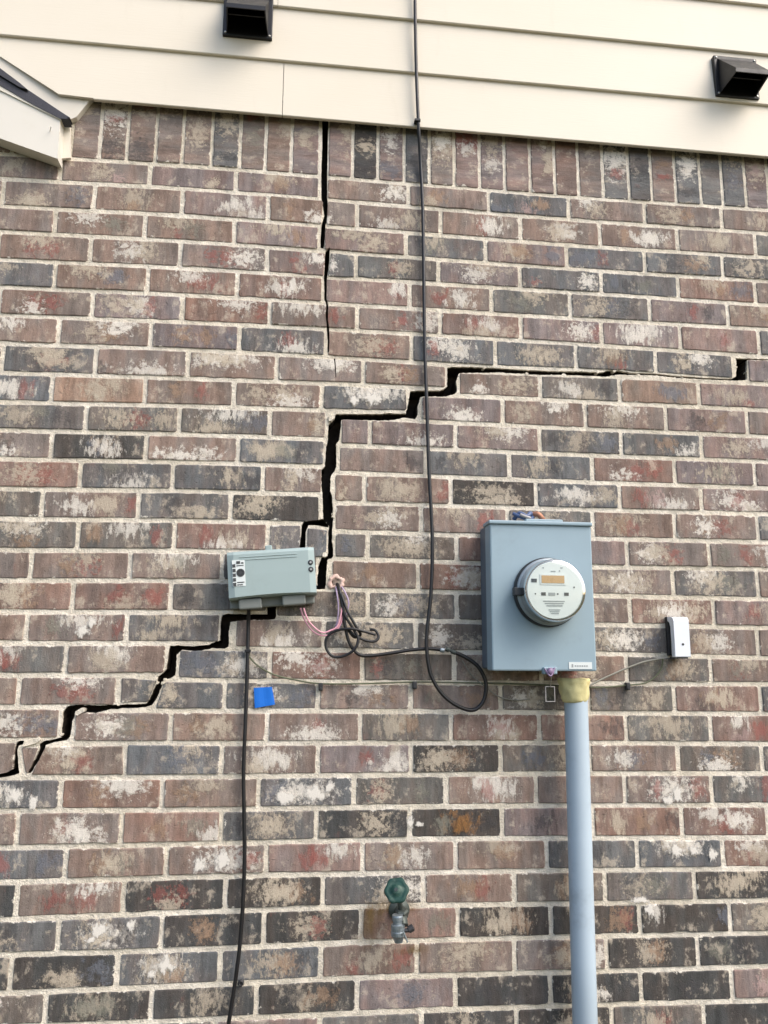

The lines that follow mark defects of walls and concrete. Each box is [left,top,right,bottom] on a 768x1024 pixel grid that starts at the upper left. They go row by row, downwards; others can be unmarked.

crack [320,121,336,377]
crack [300,359,764,589]
crack [0,607,276,777]